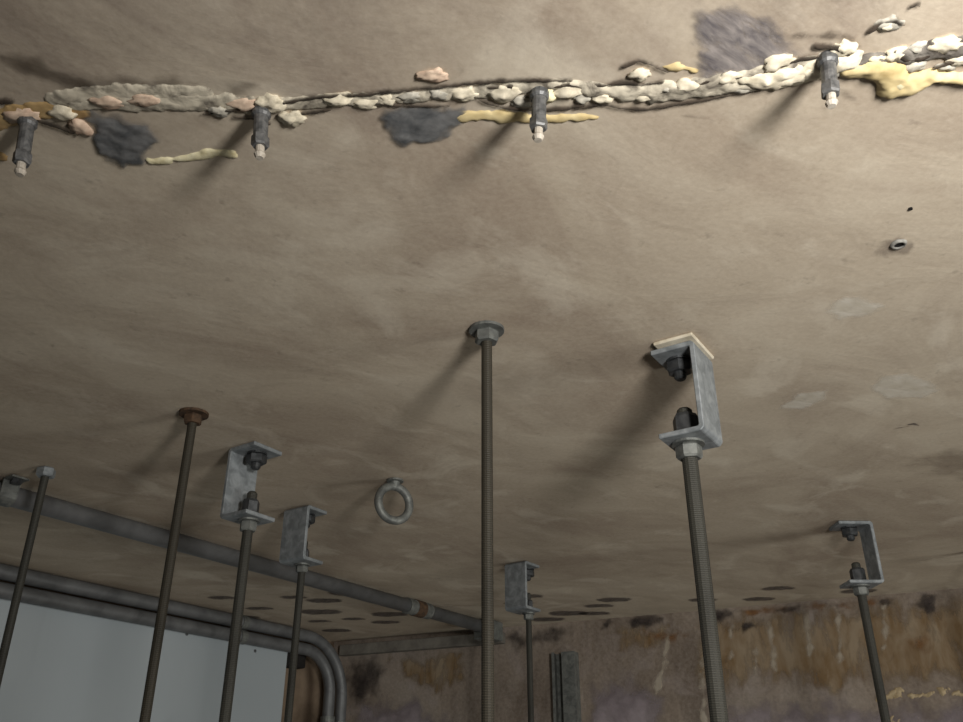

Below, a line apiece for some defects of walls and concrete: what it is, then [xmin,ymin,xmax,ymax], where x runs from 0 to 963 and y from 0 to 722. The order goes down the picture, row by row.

crack [0,2,963,161]
crack [145,148,238,165]
water stain [920,595,935,613]
water stain [631,616,662,627]
water stain [352,663,379,698]